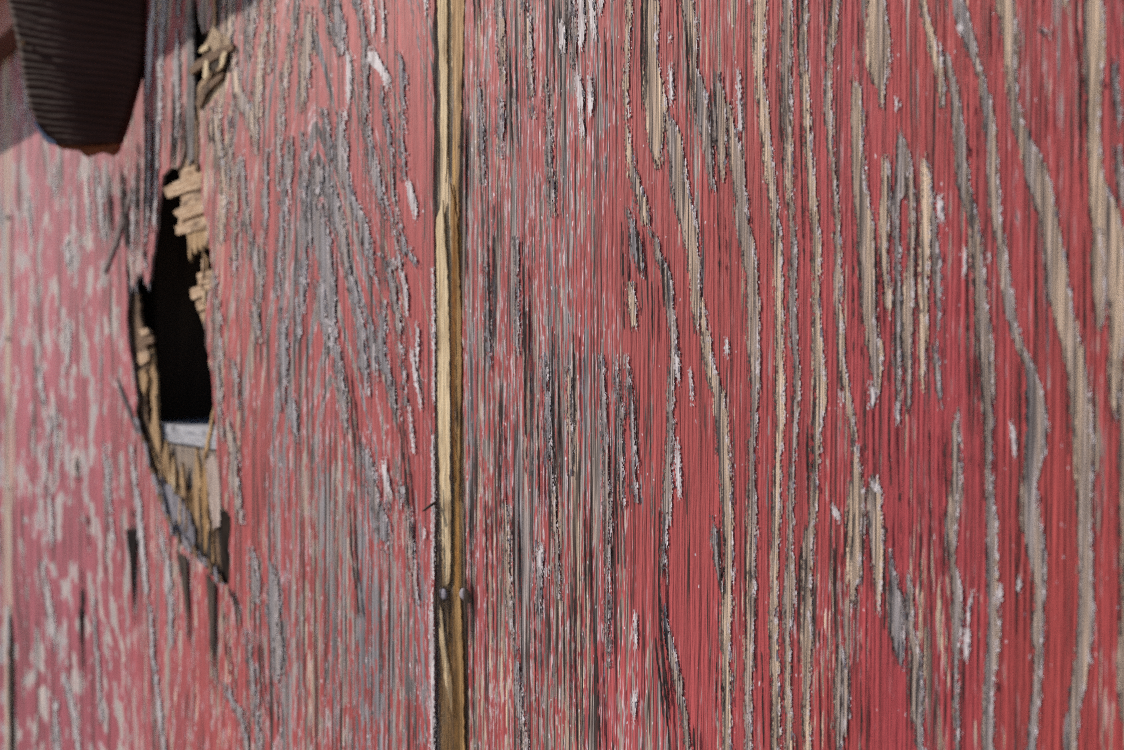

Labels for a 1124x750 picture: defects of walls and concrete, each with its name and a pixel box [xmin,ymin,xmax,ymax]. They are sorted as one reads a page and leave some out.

peeling [39,560,56,652]
peeling [50,668,82,750]
spalling [58,143,121,240]
peeling [128,0,181,273]
peeling [195,0,437,750]
peeling [474,0,506,186]
peeling [500,498,530,750]
peeling [512,236,522,357]
peeling [519,0,558,218]
peeling [531,352,575,617]
peeling [994,0,1097,750]
peeling [1081,0,1124,742]